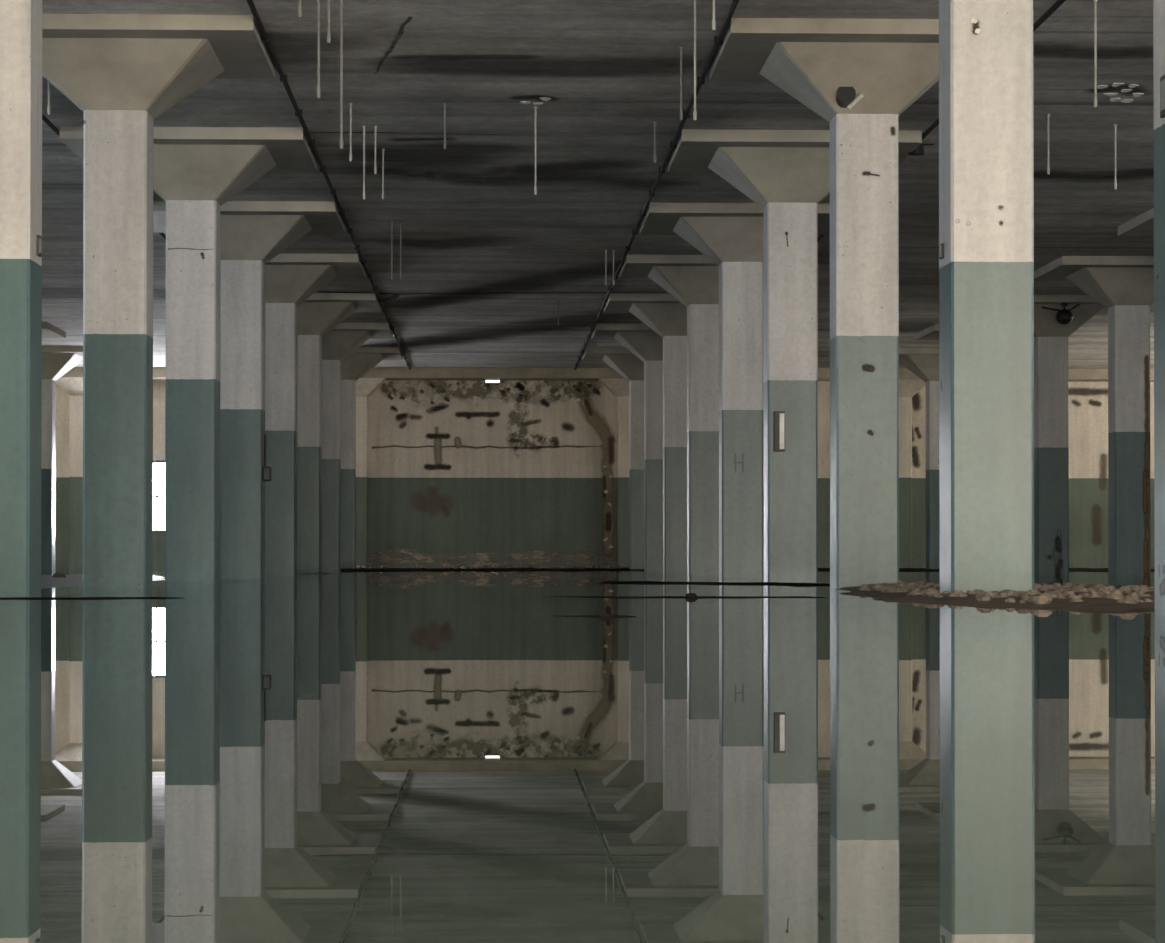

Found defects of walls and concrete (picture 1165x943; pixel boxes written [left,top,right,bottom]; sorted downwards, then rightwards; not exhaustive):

damp [399,56,675,75]
damp [352,138,504,177]
damp [463,162,679,186]
peeling [382,380,600,411]